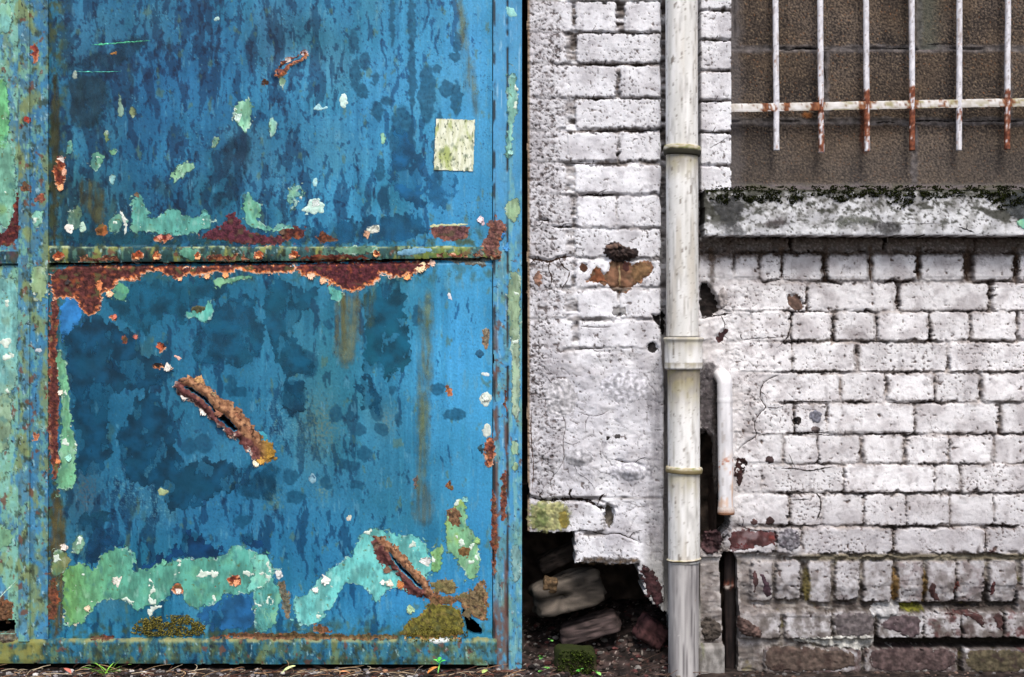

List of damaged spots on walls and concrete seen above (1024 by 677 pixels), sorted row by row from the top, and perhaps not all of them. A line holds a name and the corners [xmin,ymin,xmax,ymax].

peeling [232,97,255,133]
peeling [108,192,217,261]
spalling [700,281,728,317]
corrosion [0,75,510,643]
crack [529,410,642,543]
peeling [48,496,481,633]
spalling [509,541,668,650]